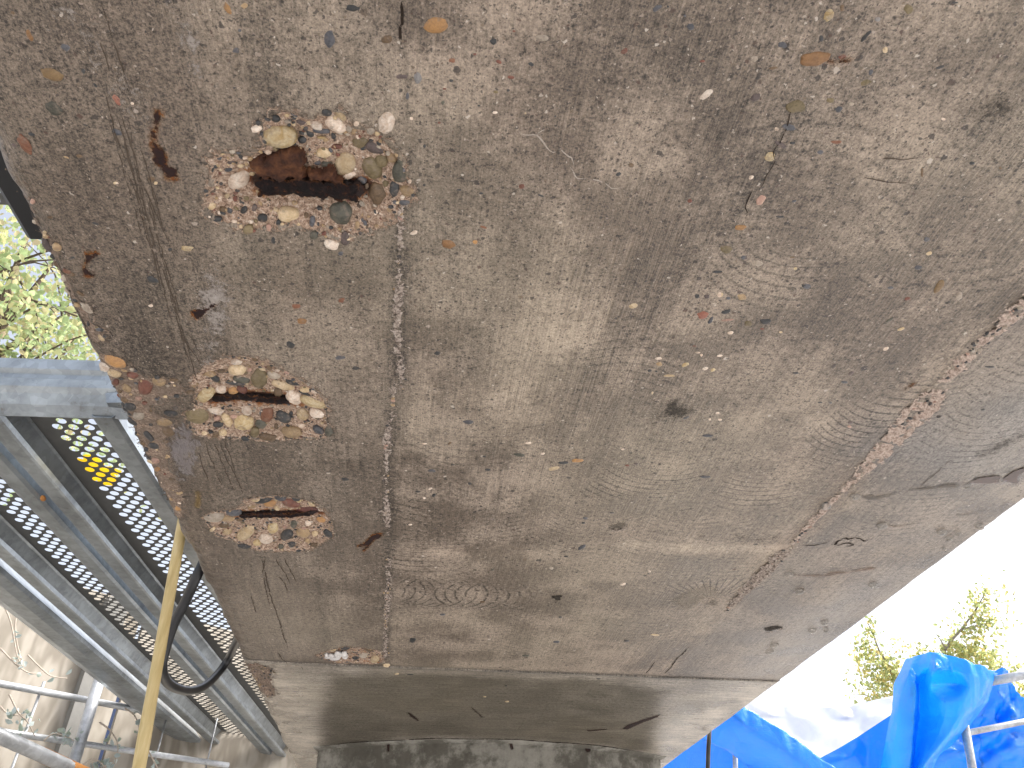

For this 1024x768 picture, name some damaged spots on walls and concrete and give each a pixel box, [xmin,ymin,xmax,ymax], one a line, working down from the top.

rust [149,109,179,181]
crack [745,91,802,218]
rust [80,251,100,278]
spalling [17,170,337,521]
rust [190,304,215,320]
spalling [197,101,423,533]
spalling [200,494,335,553]
rust [356,533,382,552]
crack [807,538,868,546]
spalling [315,557,395,667]